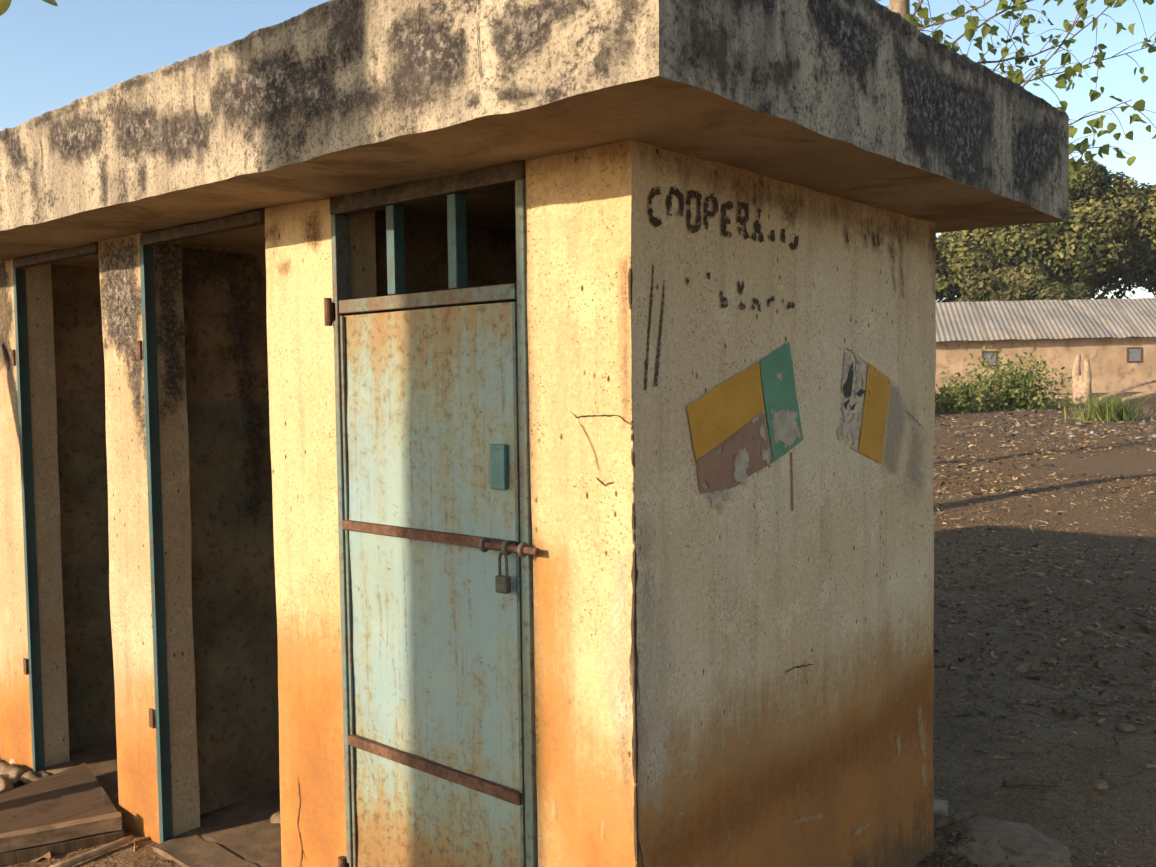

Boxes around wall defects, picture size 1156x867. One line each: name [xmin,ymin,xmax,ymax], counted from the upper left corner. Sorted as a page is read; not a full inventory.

damp [0,0,468,201]
damp [492,0,580,101]
damp [588,0,644,76]
damp [676,7,754,98]
damp [808,0,1069,195]
damp [305,215,320,246]
crack [626,257,634,309]
damp [99,238,146,446]
damp [153,243,265,520]
peeling [732,409,801,486]
crack [571,412,644,867]